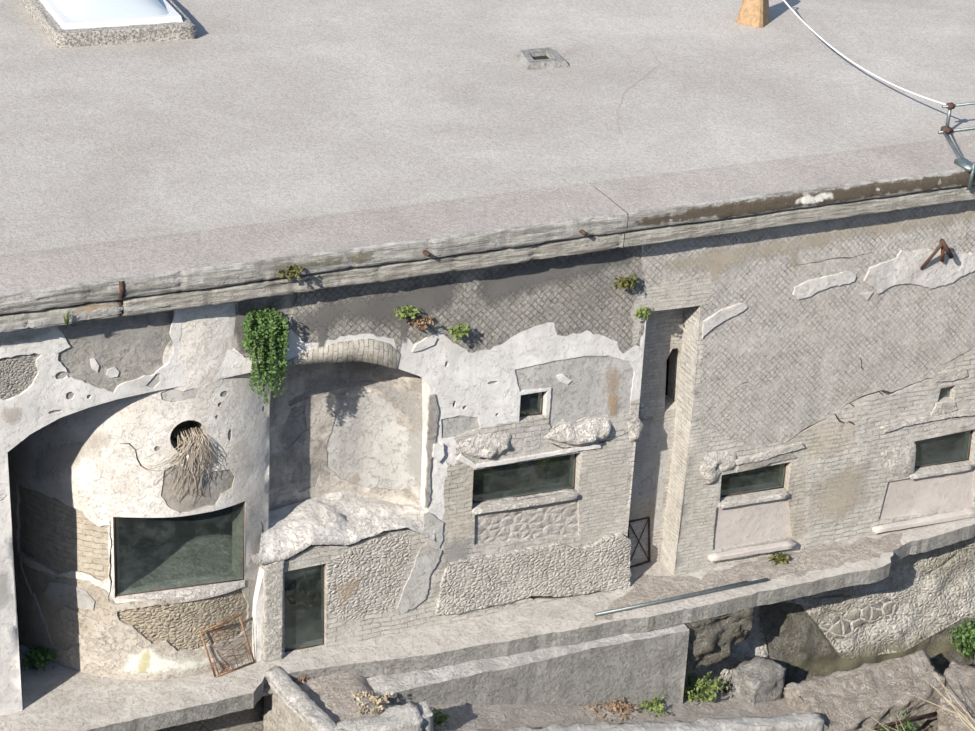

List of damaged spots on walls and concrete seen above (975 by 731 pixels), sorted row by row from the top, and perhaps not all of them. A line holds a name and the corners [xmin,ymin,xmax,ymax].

peeling [793,249,975,300]
spalling [0,305,198,402]
peeling [412,337,437,352]
peeling [702,303,748,339]
crack [835,378,929,425]
peeling [735,442,805,473]
spalling [19,484,247,650]